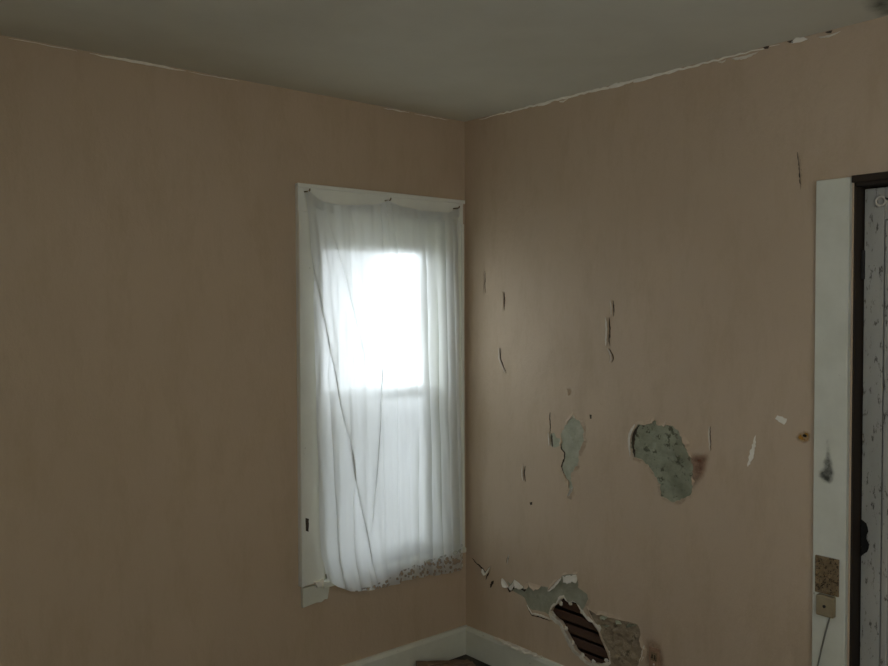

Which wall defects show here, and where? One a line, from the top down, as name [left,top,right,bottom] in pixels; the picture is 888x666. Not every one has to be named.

peeling [548,411,592,500]
peeling [628,417,696,506]
flaking render [501,572,648,666]